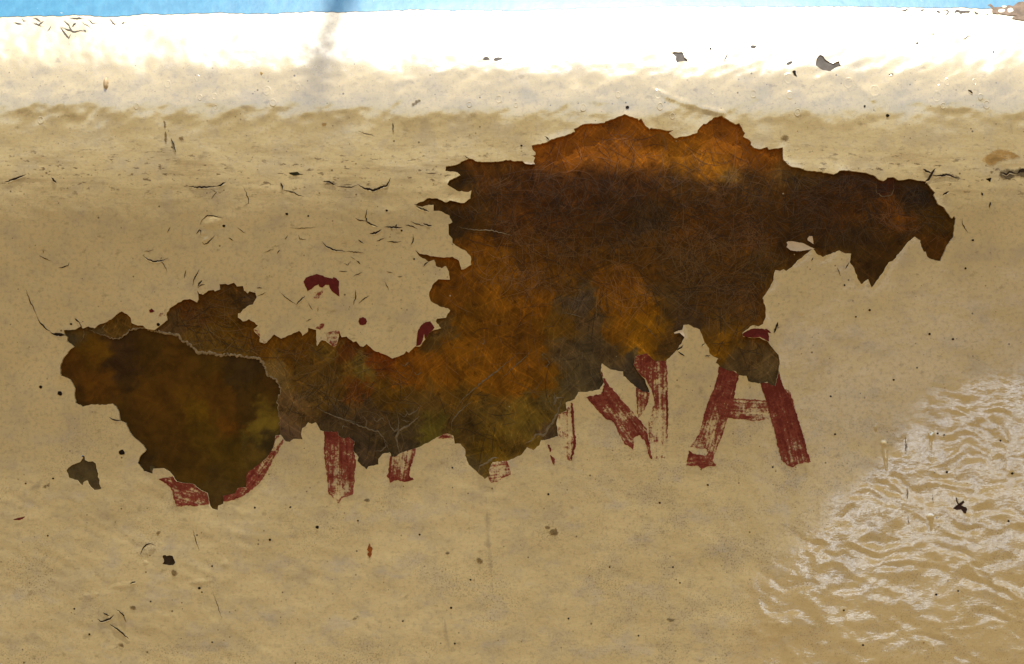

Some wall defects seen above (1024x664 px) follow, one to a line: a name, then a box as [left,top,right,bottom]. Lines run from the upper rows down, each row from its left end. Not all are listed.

peeling [816,55,840,71]
peeling [61,115,955,510]